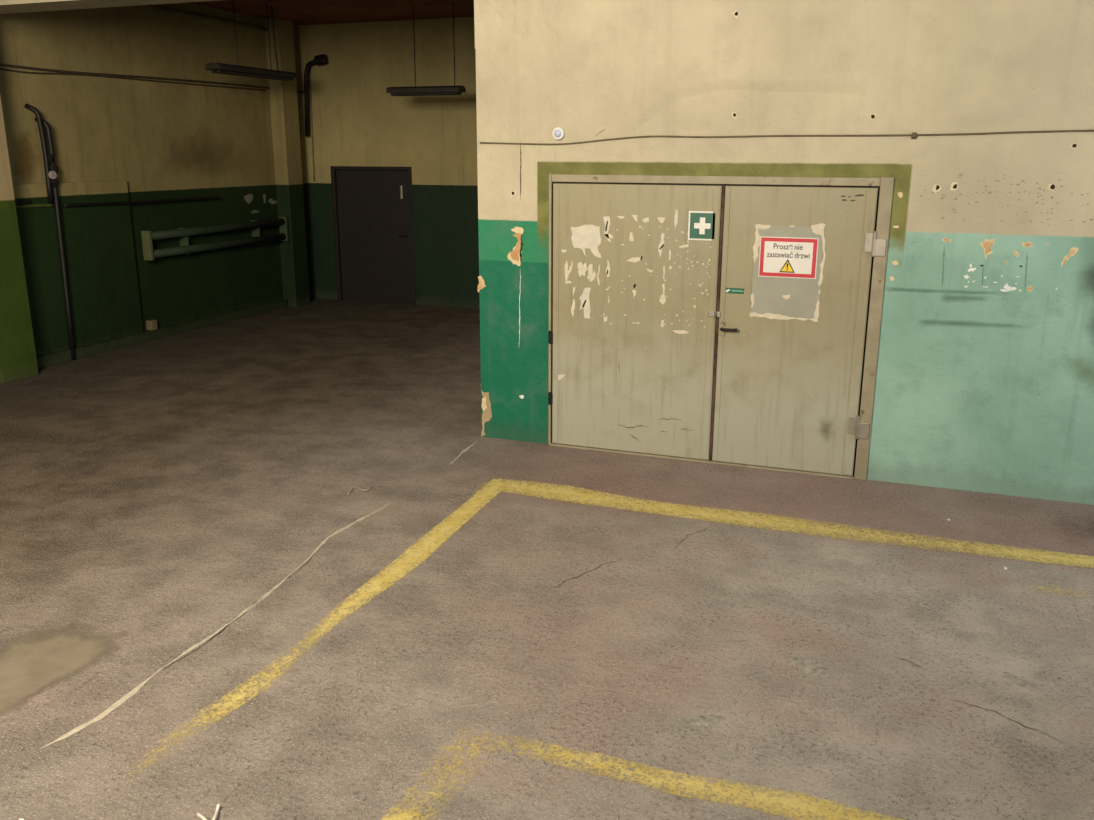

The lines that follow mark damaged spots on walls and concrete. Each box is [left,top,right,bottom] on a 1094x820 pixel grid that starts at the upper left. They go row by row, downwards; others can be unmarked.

spalling [920,173,1089,226]
peeling [507,227,524,266]
peeling [963,239,1033,292]
peeling [1061,247,1078,267]
flaking render [480,383,492,437]